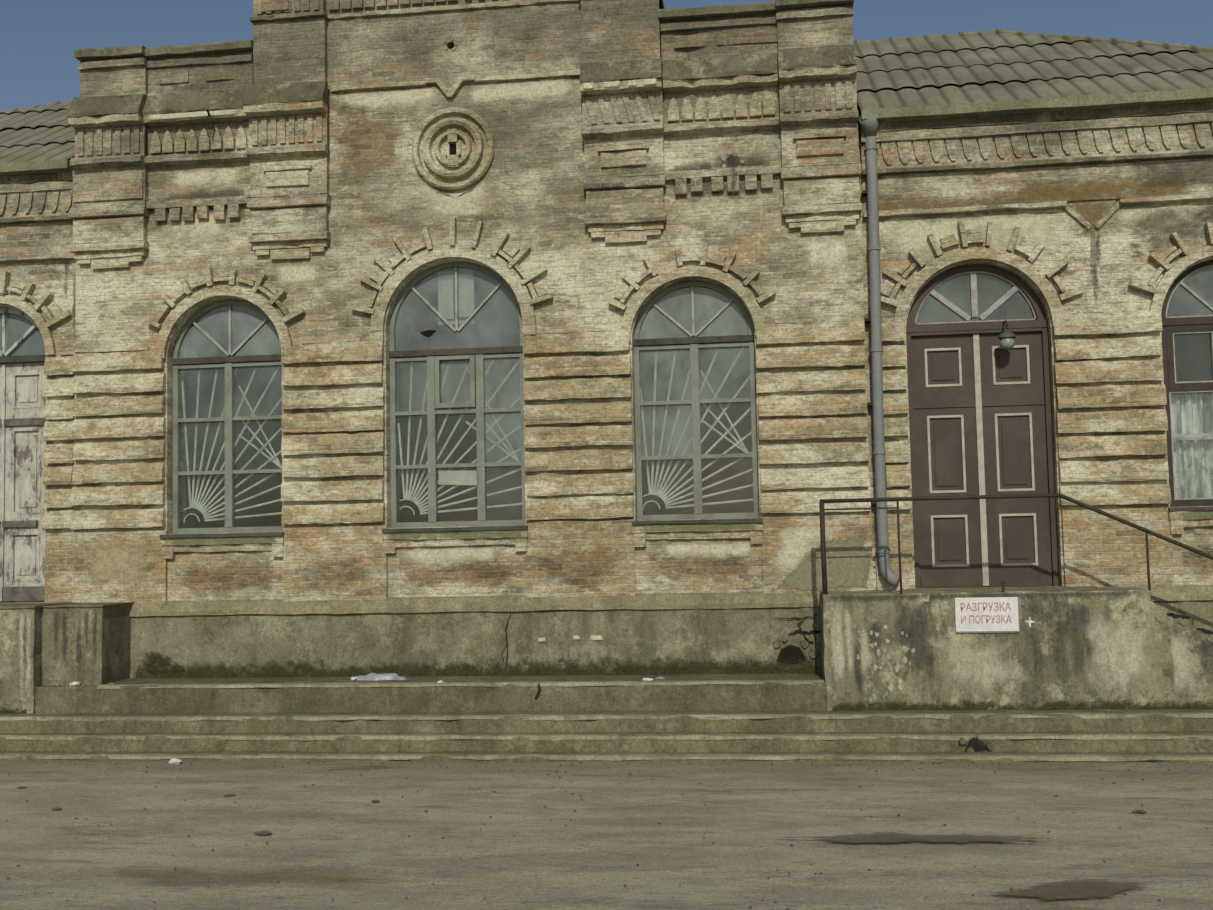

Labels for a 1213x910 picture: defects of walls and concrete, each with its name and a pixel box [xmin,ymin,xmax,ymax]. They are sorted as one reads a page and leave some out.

water stain [830,605,1023,693]